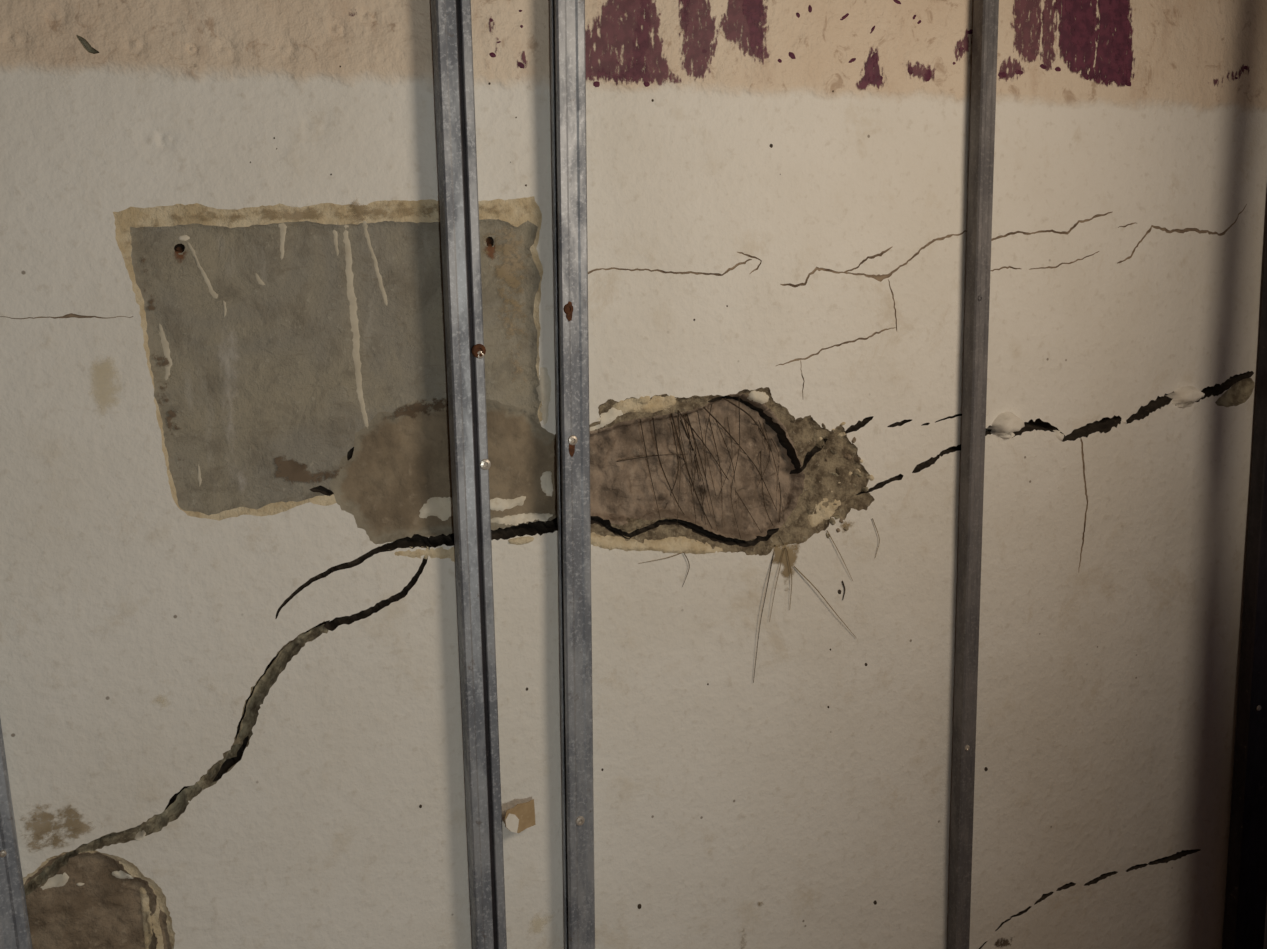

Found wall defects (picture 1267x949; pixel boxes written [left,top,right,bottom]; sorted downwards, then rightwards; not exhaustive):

spalling [113,199,455,562]
spalling [478,196,558,545]
crack [491,517,558,541]
crack [590,516,779,547]
spalling [589,387,880,683]
crack [588,204,1247,394]
crack [708,371,1254,568]
spalling [23,850,175,949]
crack [979,849,1201,949]